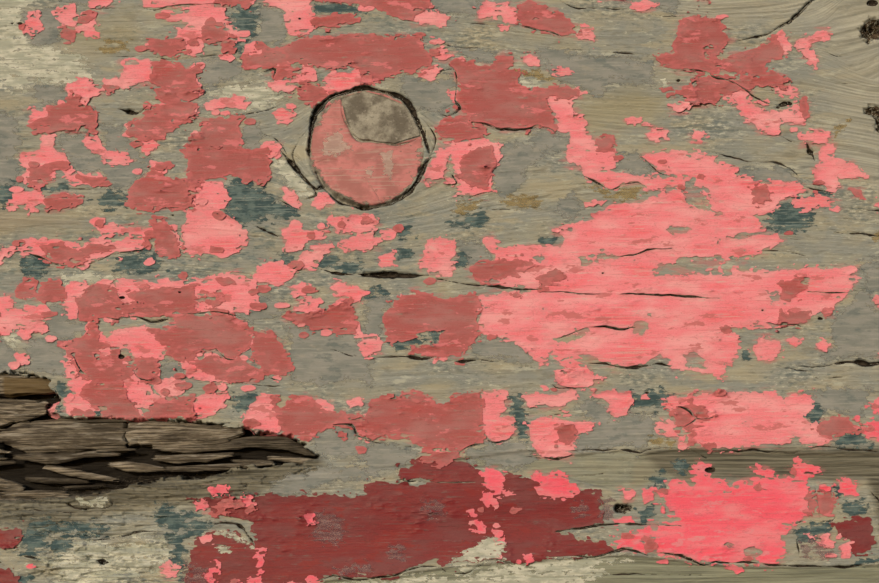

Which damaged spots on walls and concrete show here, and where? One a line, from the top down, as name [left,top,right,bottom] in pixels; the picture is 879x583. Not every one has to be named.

crack [739,0,814,41]
peeling [114,0,869,391]
crack [313,267,538,290]
peeling [31,402,62,421]
peeling [609,456,879,574]
peeling [0,516,110,583]